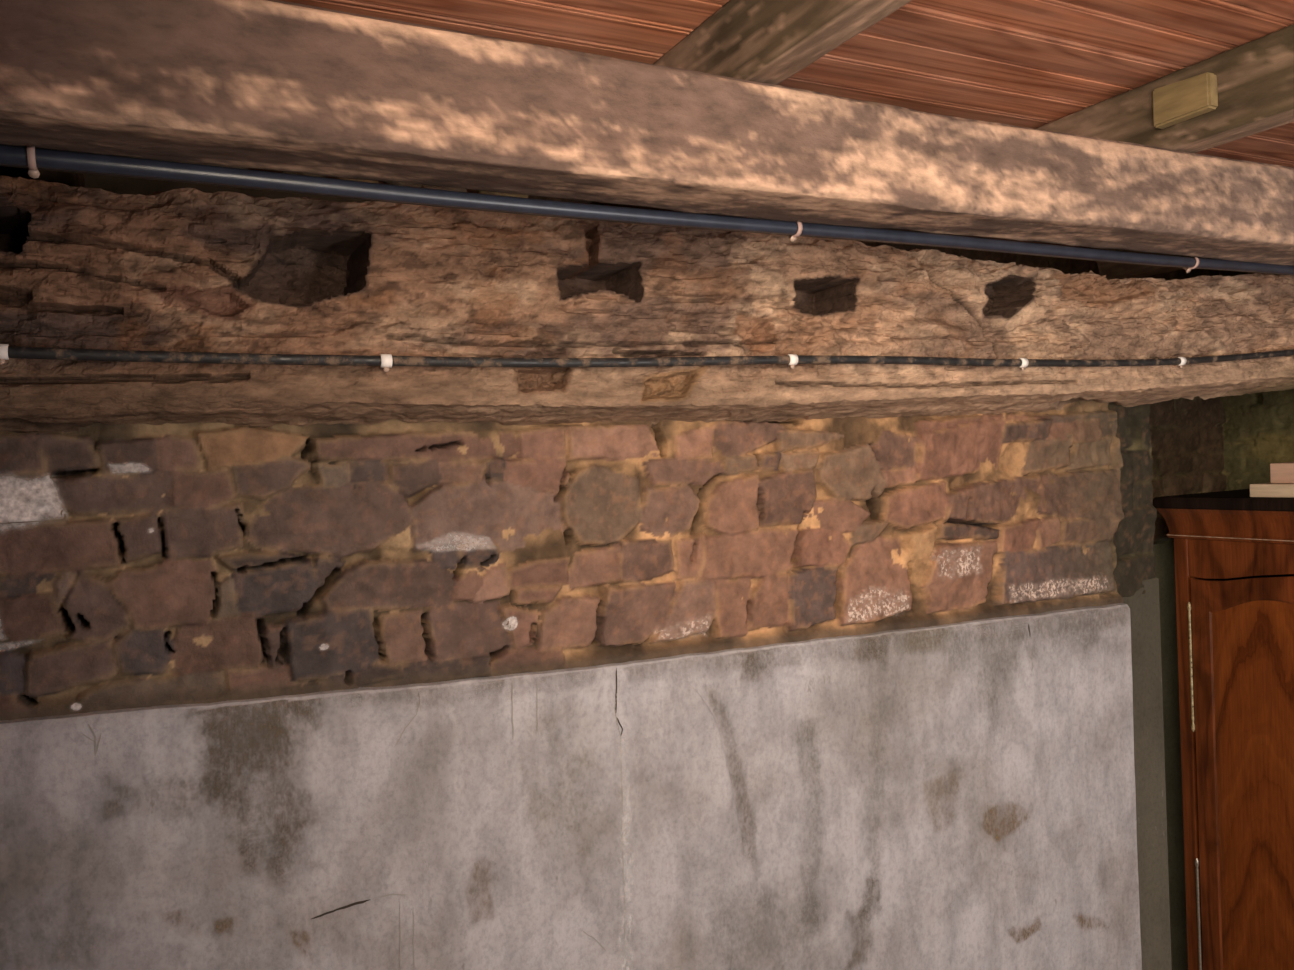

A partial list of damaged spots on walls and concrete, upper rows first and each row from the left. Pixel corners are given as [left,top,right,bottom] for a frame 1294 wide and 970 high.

water stain [0,476,64,526]
water stain [942,550,979,577]
water stain [1018,579,1107,598]
water stain [848,590,909,621]
water stain [209,699,314,805]